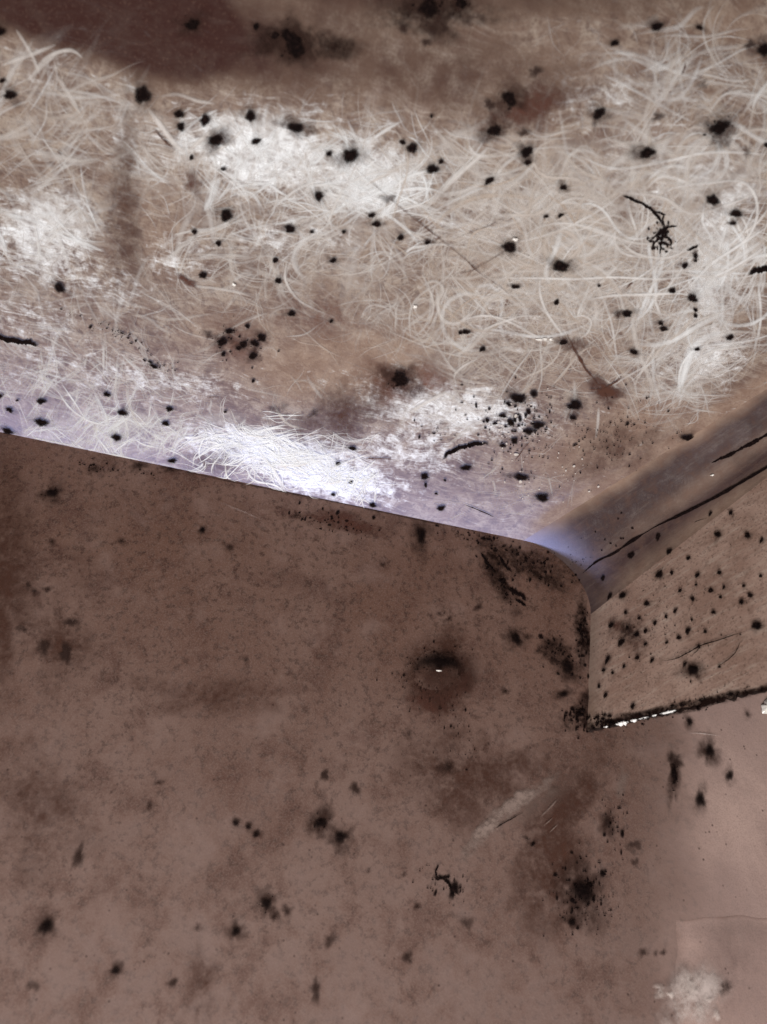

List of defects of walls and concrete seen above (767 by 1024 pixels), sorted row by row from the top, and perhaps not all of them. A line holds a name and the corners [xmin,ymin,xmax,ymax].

mould [200,114,228,150]
mould [283,119,303,134]
mould [326,149,358,163]
mould [624,196,677,253]
mould [553,261,569,272]
water stain [0,335,37,347]
mould [199,316,266,383]
water stain [414,376,670,507]
crack [583,434,767,573]
mould [189,472,634,606]
mould [602,571,725,683]
mould [512,604,767,739]